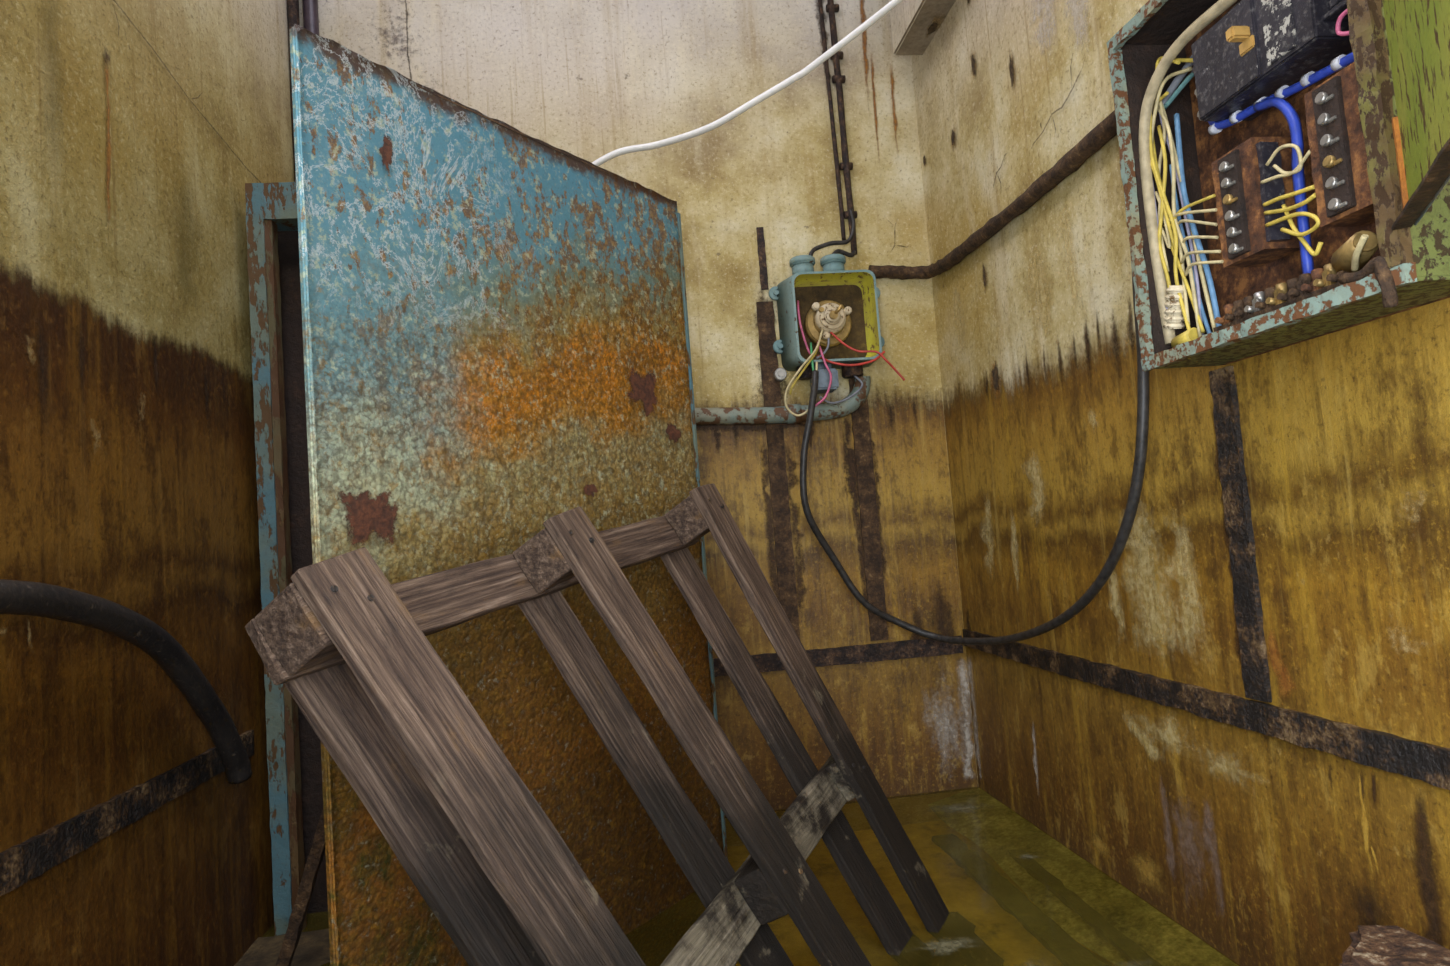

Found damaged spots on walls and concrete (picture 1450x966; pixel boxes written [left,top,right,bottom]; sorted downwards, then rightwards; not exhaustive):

rust [860,0,897,150]
rust [696,424,779,601]
rust [785,447,806,607]
rust [844,419,867,600]
water stain [696,295,1450,966]